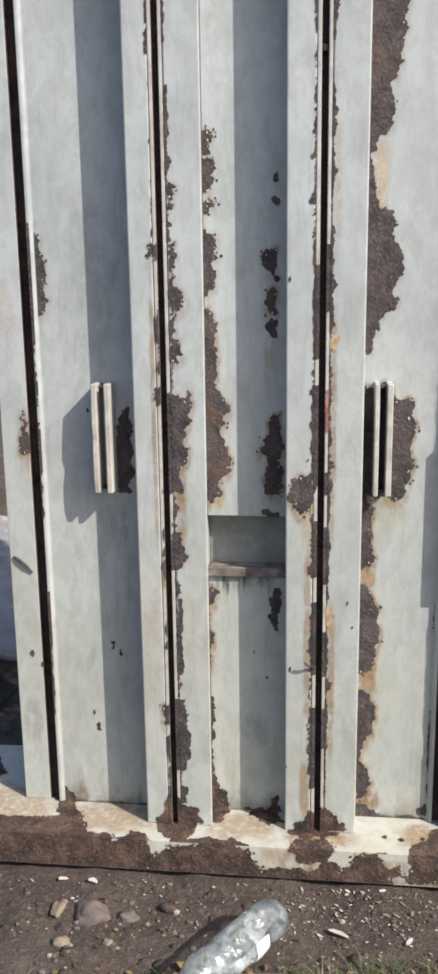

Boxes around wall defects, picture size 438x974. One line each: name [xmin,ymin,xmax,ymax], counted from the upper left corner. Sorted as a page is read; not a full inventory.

rust [201,124,220,216]
rust [365,0,411,355]
rust [26,223,49,407]
rust [116,406,136,494]
rust [163,84,192,782]
rust [202,228,234,508]
rust [256,0,339,599]
rust [209,584,220,667]
rust [0,732,438,887]
rust [210,696,230,823]
rust [301,602,316,790]
rust [355,382,421,817]